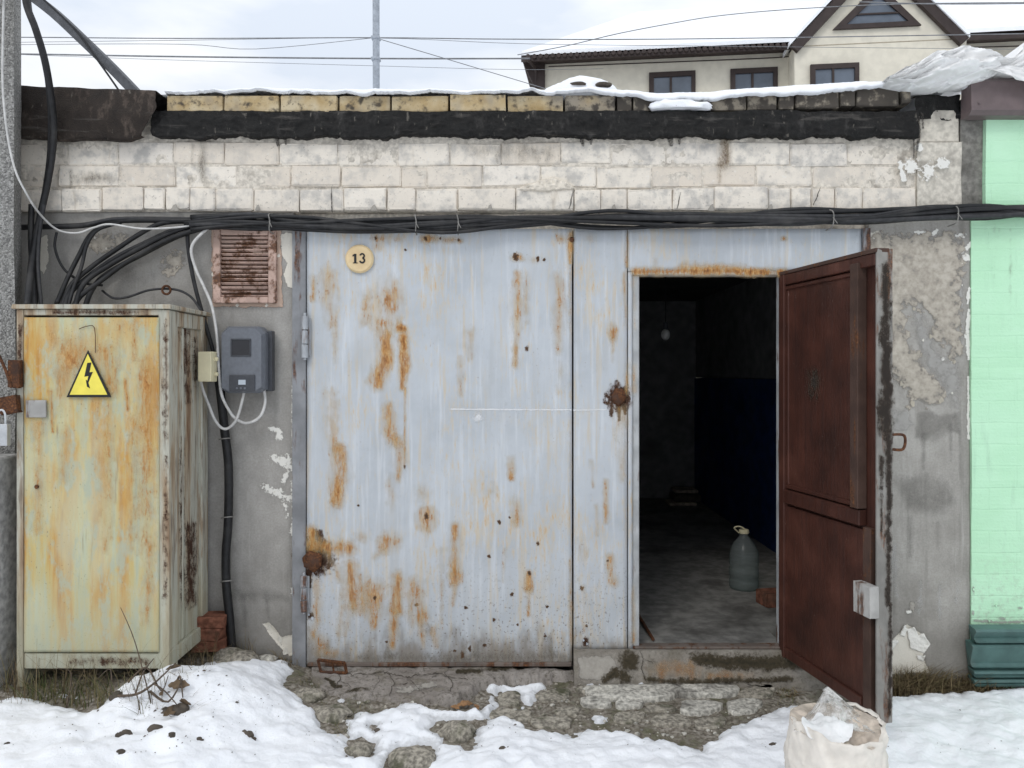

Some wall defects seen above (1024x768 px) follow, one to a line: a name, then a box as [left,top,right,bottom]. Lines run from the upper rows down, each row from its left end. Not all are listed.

peeling [897,143,953,182]
corrosion [624,256,784,290]
corrosion [369,282,410,403]
peeling [871,228,971,440]
corrosion [603,376,635,421]
peeling [260,393,292,536]
corrosion [328,438,347,505]
corrosion [876,262,895,716]
corrosion [306,528,435,647]
corrosion [510,571,533,596]
spalling [263,622,292,656]
spalling [892,602,930,674]